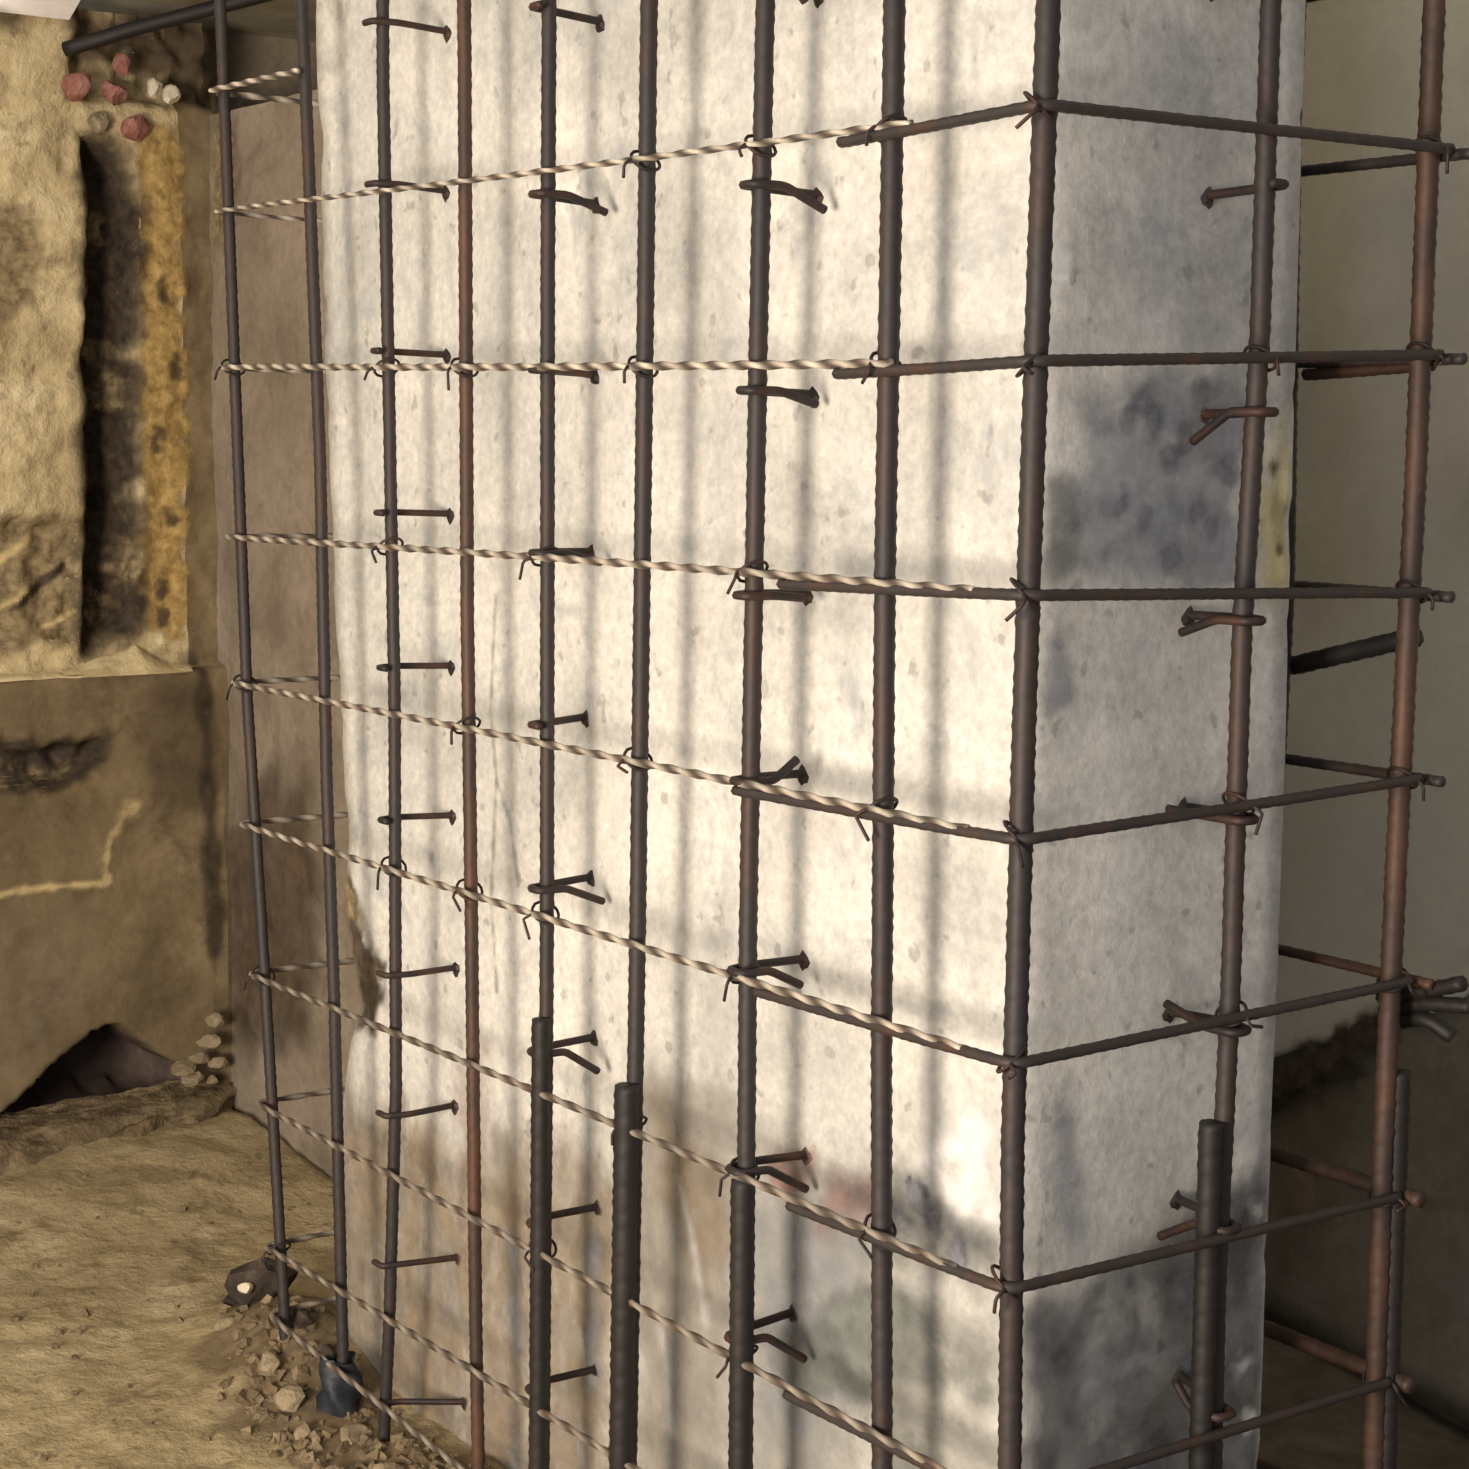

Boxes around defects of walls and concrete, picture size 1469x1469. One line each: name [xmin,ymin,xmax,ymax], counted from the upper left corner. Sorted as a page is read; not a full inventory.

flaking render [0,124,191,657]
damp [1048,373,1242,581]
damp [1024,1216,1196,1469]
damp [1222,1090,1333,1469]